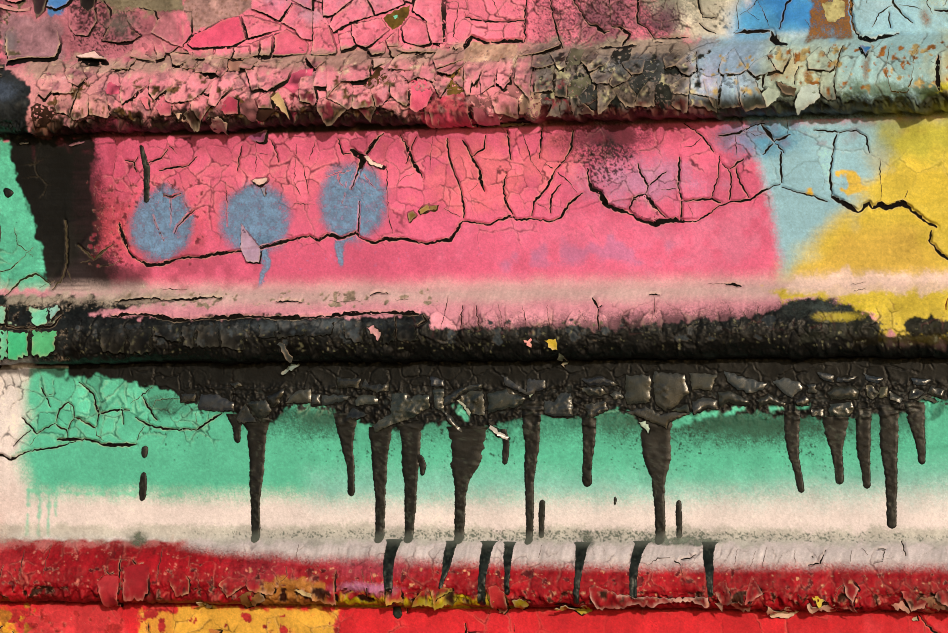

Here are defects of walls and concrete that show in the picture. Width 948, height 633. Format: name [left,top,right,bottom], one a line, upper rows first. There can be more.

peeling [822,0,845,22]
peeling [0,0,837,145]
crack [0,0,948,352]
peeling [0,305,63,368]
peeling [179,320,946,440]
crack [0,381,223,462]
peeling [97,563,151,607]
peeling [295,569,338,606]
peeling [384,584,458,611]
peeling [486,584,530,615]
peeling [554,572,861,619]
peeling [889,586,948,622]